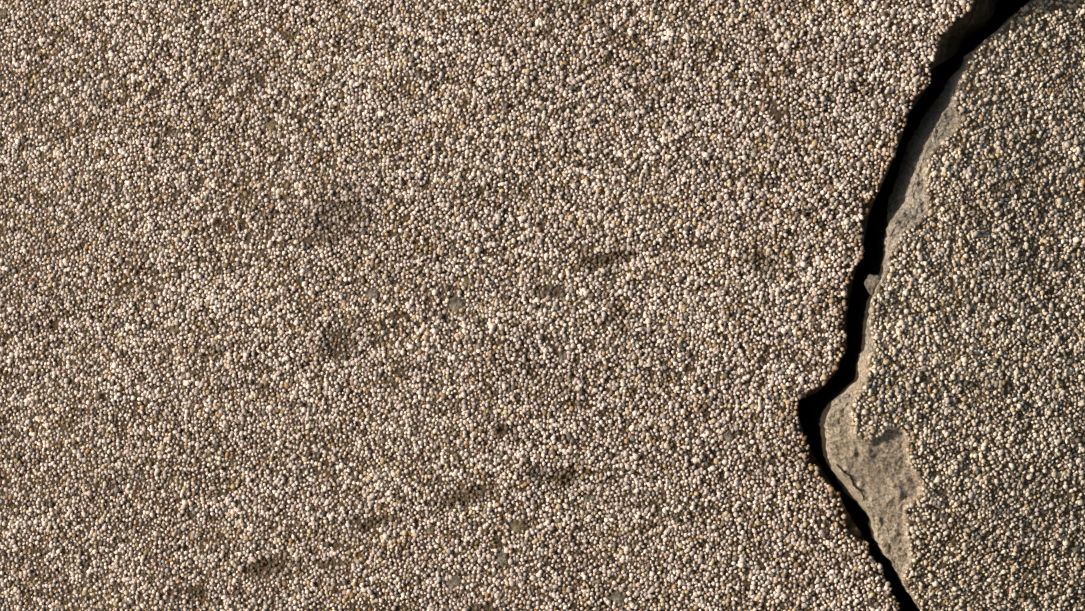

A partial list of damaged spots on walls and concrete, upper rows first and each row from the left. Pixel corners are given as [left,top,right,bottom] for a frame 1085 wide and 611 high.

spalling [824,352,924,588]
crack [796,0,1035,611]